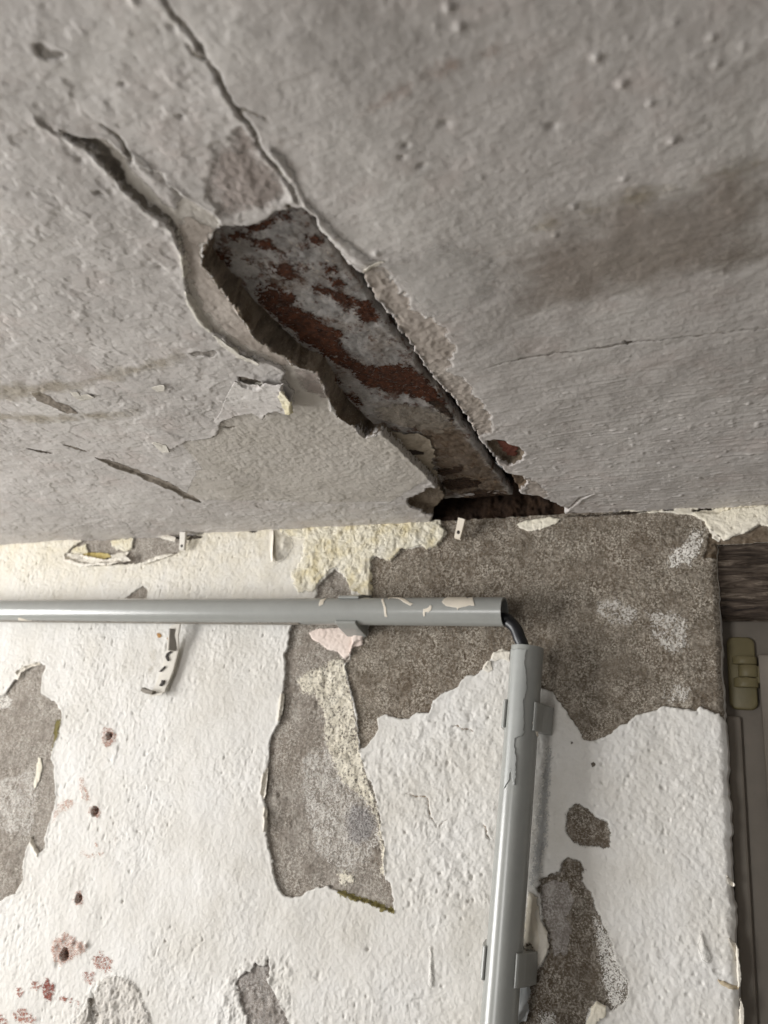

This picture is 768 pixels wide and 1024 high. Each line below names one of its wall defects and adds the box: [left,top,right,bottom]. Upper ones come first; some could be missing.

crack [172,10,283,175]
crack [43,122,184,253]
rust [216,209,507,498]
flaking render [64,535,188,567]
flaking render [95,133,768,914]
flaking render [0,662,62,901]
flaking render [236,959,289,1024]
flaking render [518,857,631,1024]
peeling [718,938,744,1024]